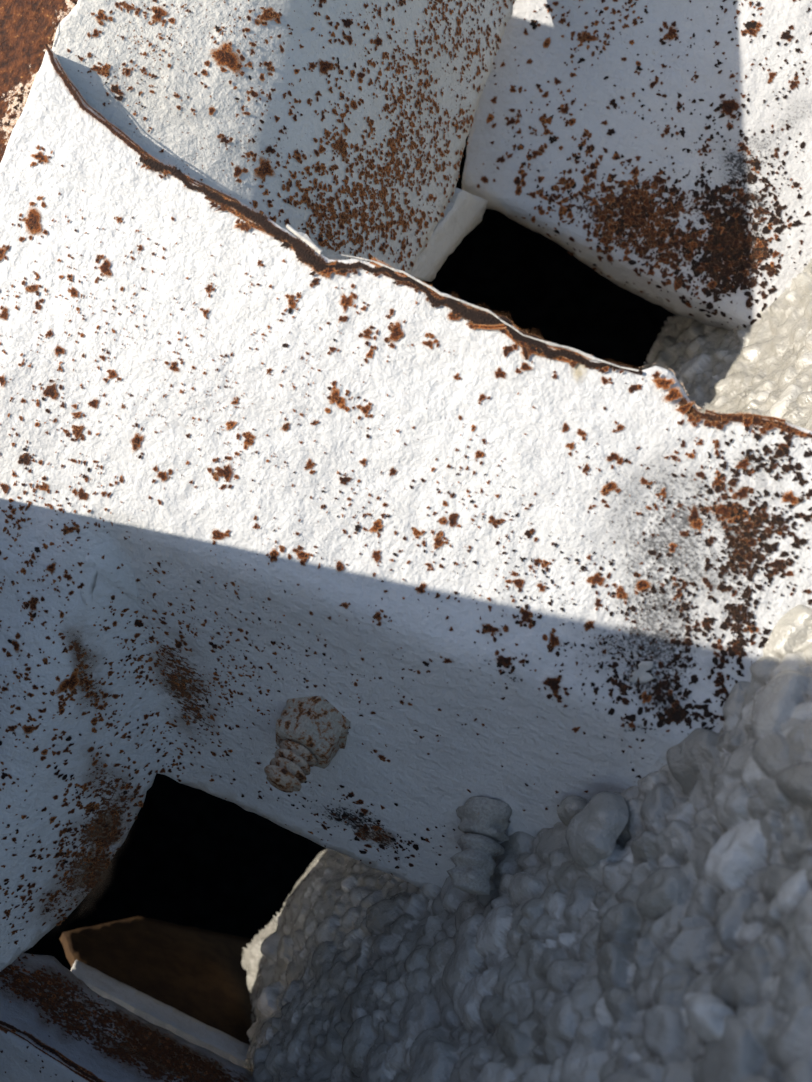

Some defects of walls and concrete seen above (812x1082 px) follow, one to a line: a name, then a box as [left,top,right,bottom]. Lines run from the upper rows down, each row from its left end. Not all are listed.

rust [30,145,53,167]
crack [44,19,160,163]
rust [67,0,812,450]
rust [0,196,382,1082]
rust [258,781,455,875]
rust [252,397,812,778]